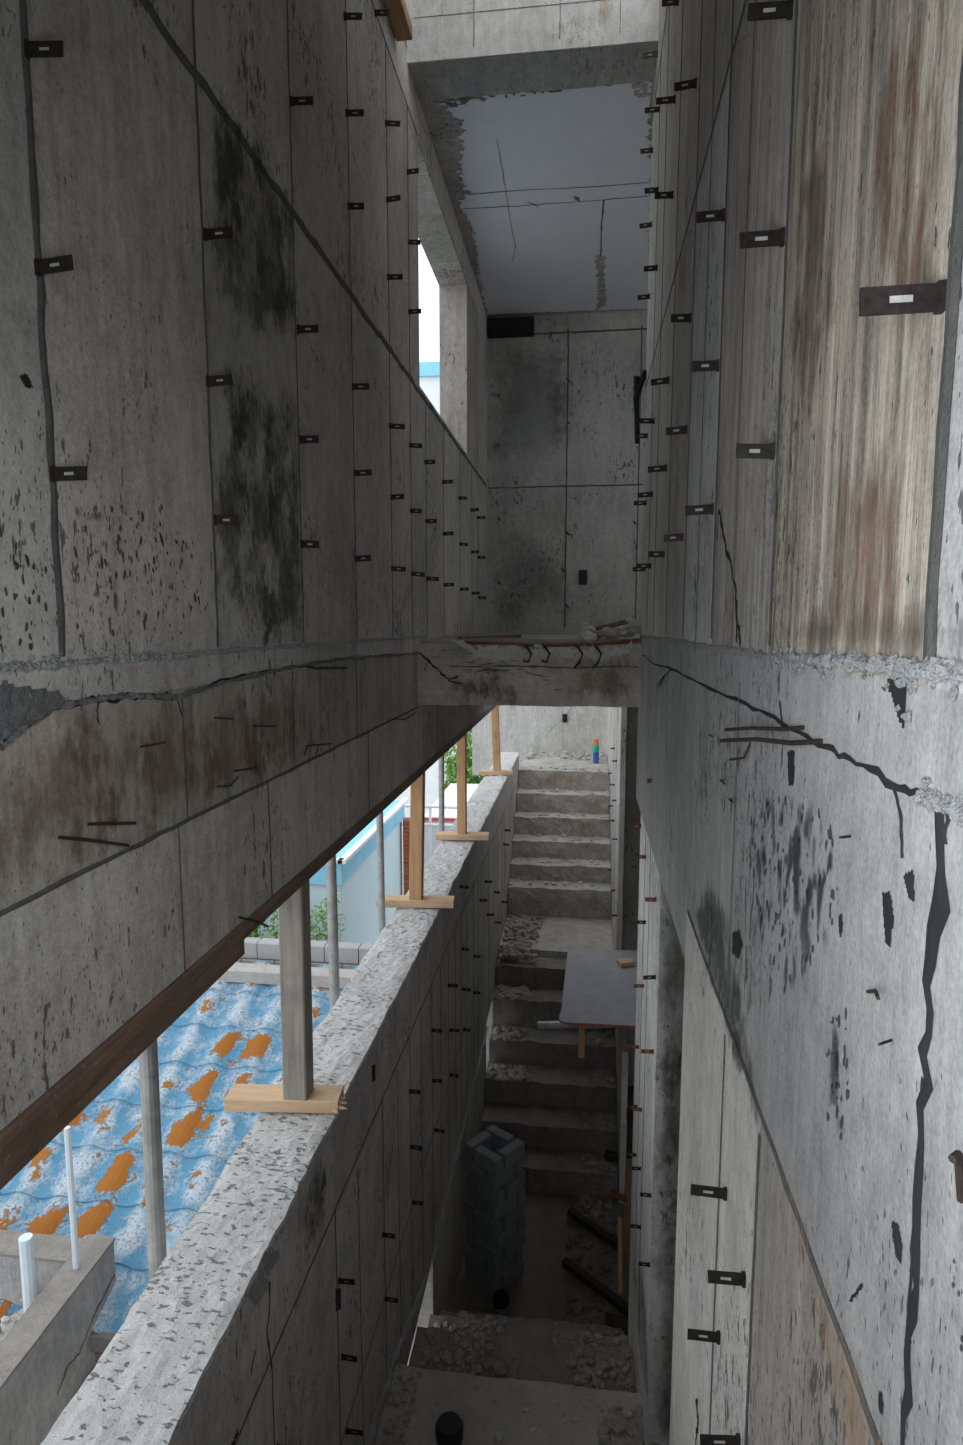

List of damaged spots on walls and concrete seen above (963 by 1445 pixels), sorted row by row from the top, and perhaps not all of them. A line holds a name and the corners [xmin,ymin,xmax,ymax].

damp [212,119,295,329]
spalling [0,497,429,741]
crack [0,652,461,751]
damp [219,389,301,640]
spalling [450,634,963,728]
crack [642,655,963,1445]